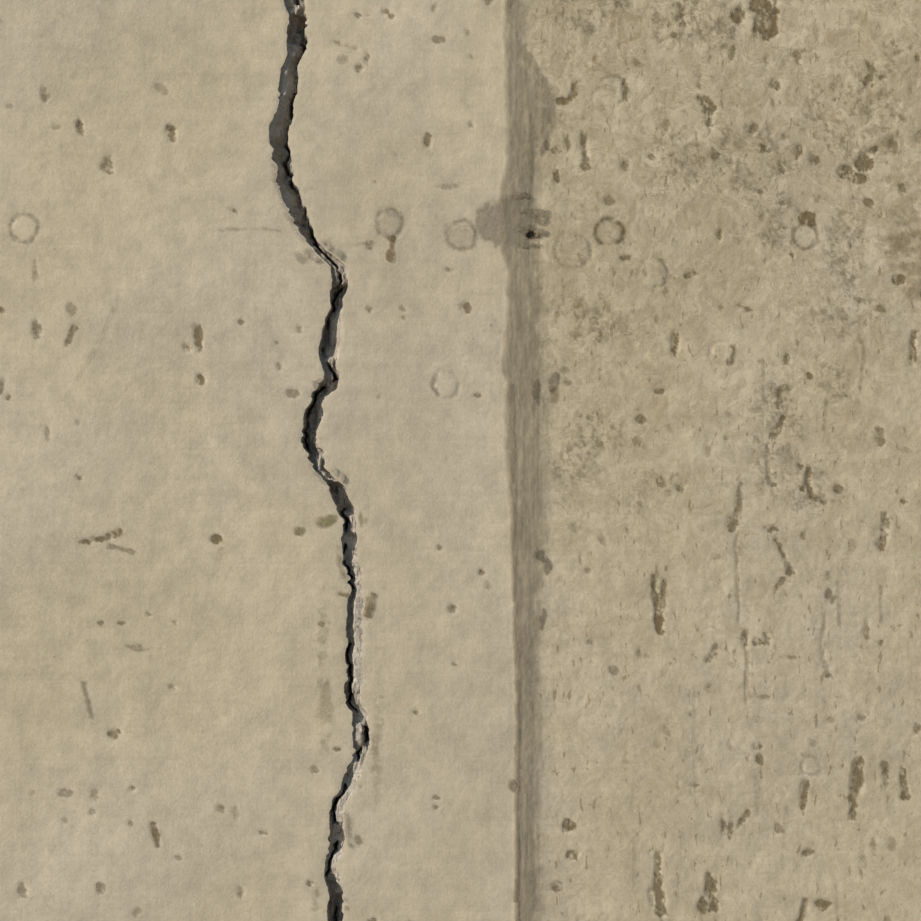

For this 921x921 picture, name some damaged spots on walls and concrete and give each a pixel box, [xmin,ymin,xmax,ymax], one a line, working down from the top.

crack [269,0,376,921]